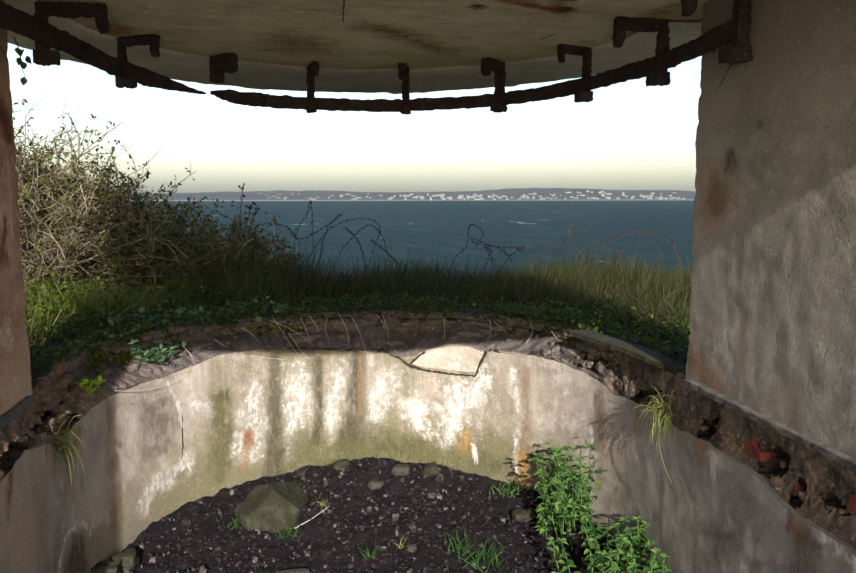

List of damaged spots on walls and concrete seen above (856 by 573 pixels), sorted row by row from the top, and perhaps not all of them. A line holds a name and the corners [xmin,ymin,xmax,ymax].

crack [288,346,556,377]
spalling [562,352,608,372]
spalling [632,385,663,407]
spalling [0,410,54,477]
water stain [232,353,492,477]
water stain [509,367,528,484]
spalling [697,417,720,439]
spalling [759,447,791,478]
spalling [790,479,808,509]
spalling [821,491,851,516]